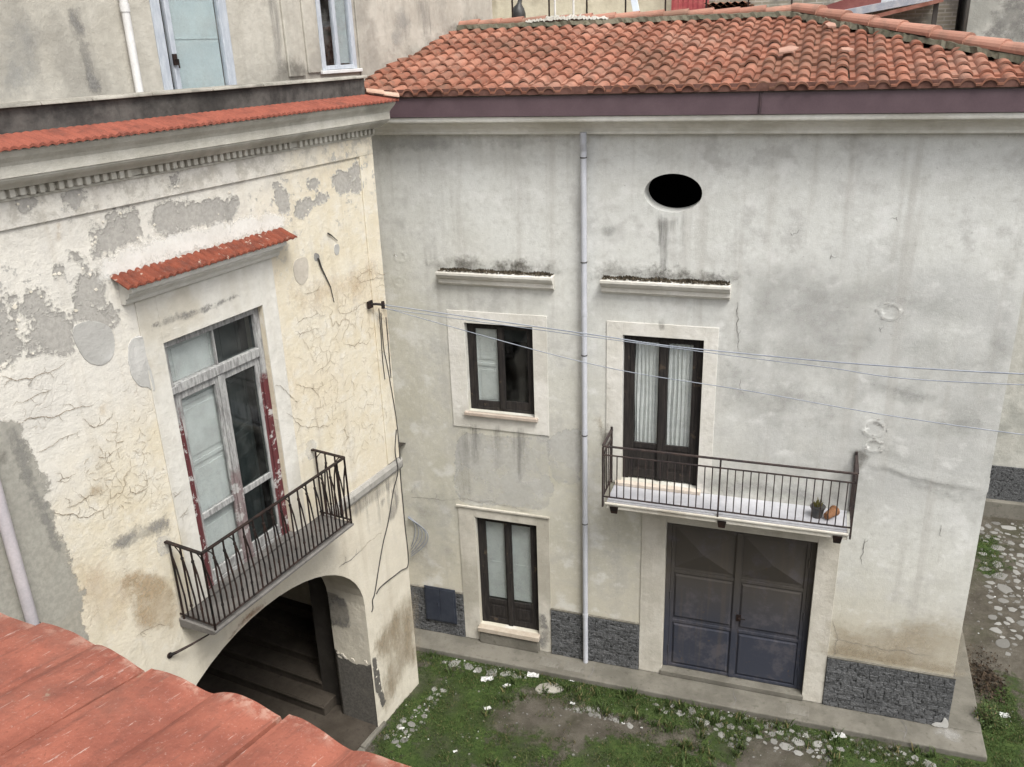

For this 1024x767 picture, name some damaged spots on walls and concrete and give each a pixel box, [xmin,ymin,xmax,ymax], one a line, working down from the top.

crack [3,359,187,519]
peeling [0,169,240,372]
peeling [272,161,364,220]
crack [277,267,391,460]